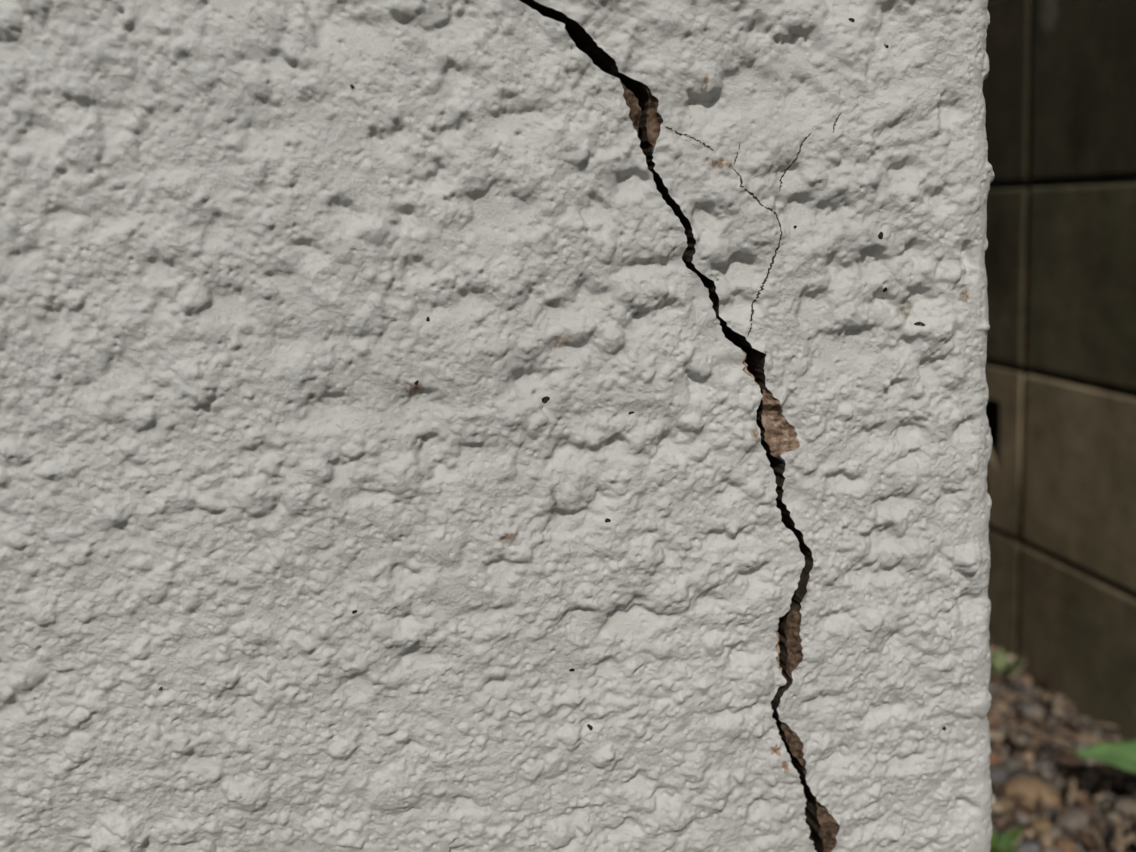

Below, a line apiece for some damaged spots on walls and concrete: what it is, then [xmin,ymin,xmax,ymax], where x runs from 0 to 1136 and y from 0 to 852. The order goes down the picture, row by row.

crack [519,0,841,852]